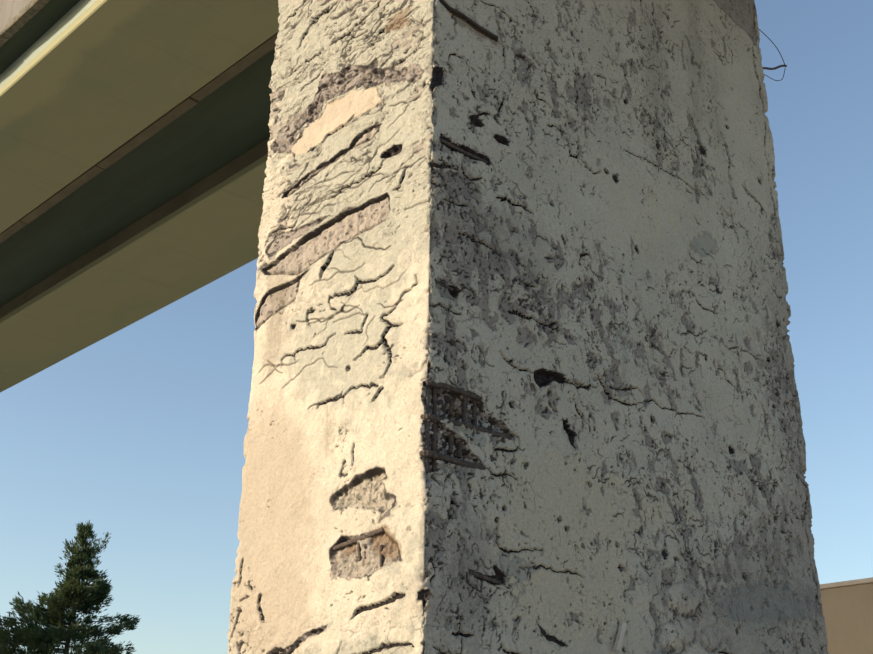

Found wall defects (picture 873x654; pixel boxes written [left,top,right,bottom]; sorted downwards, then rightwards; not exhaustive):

spalling [270,63,444,158]
spalling [282,124,381,198]
crack [271,164,383,236]
crack [321,253,334,278]
crack [307,267,394,325]
crack [287,284,418,405]
spalling [534,368,566,388]
spalling [419,378,516,475]
spalling [326,467,401,581]
crack [234,560,265,654]
crack [355,592,406,616]
crack [362,616,472,654]